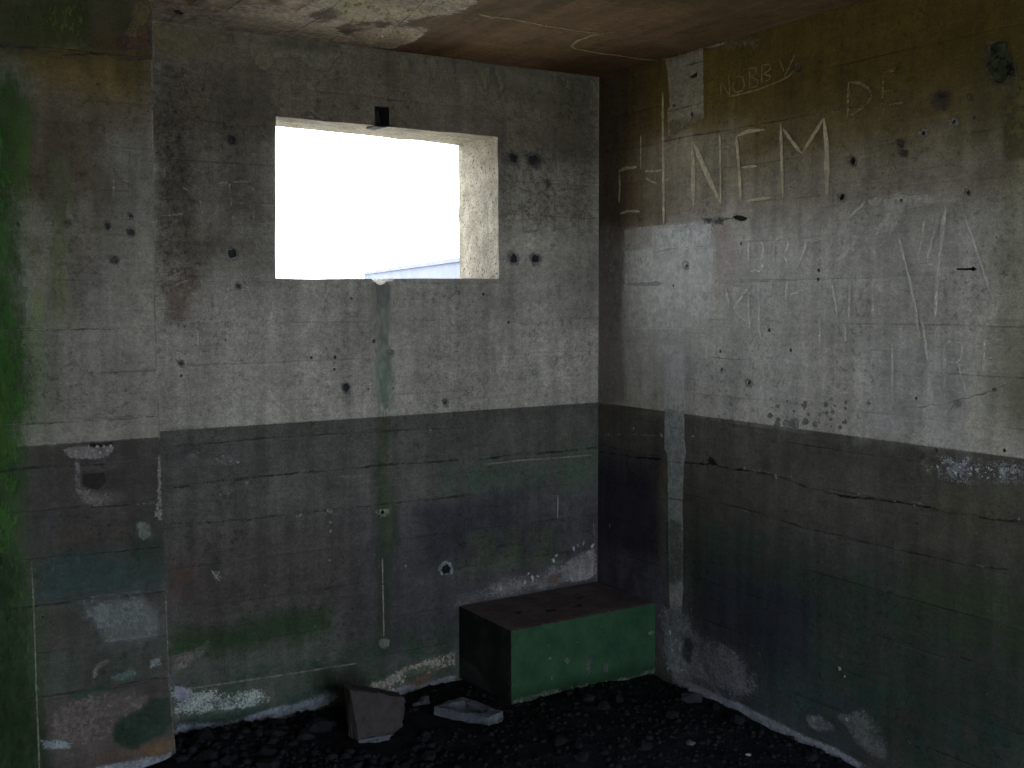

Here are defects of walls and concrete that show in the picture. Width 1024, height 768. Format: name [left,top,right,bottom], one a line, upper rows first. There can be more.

spalling [984,38,1017,87]
damp [376,283,388,305]
peeling [64,442,114,460]
crack [174,447,1020,522]
damp [31,562,40,768]
damp [170,683,343,736]